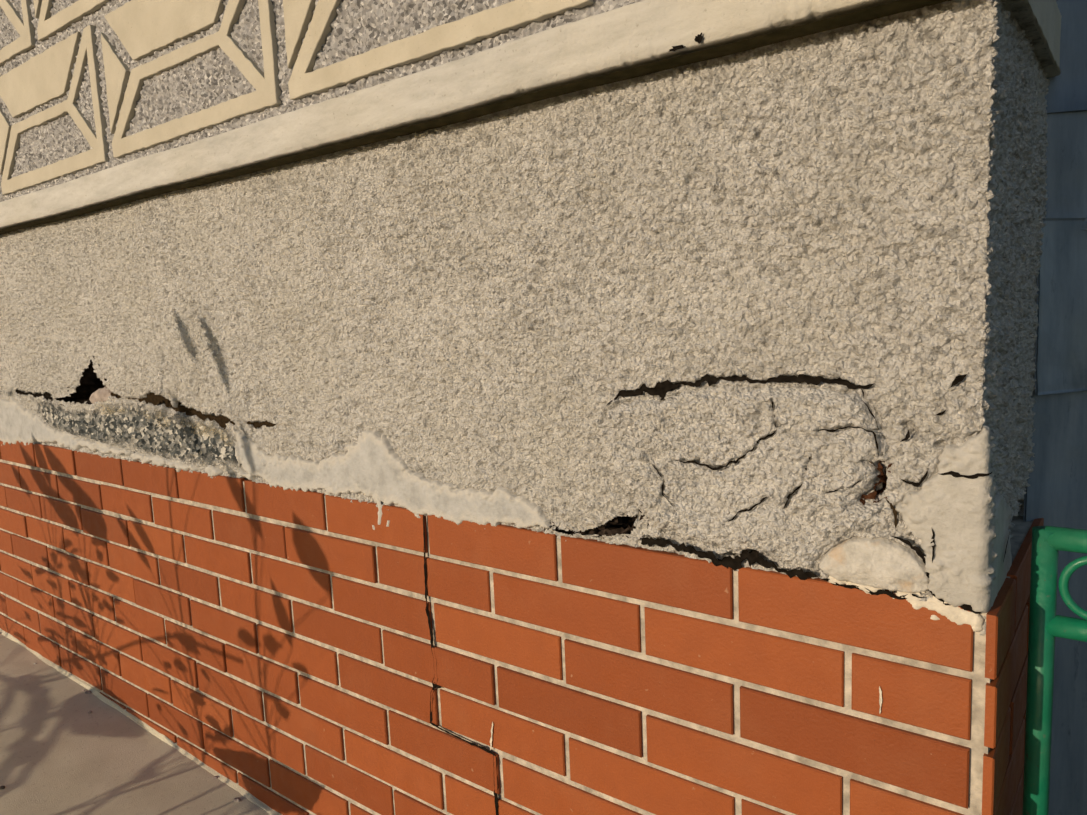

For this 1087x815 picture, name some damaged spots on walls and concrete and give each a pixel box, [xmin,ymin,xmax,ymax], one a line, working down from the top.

crack [16,389,52,401]
peeling [37,356,242,468]
crack [110,392,276,429]
crack [607,374,910,521]
crack [936,374,967,415]
crack [641,471,992,614]
crack [423,515,498,815]